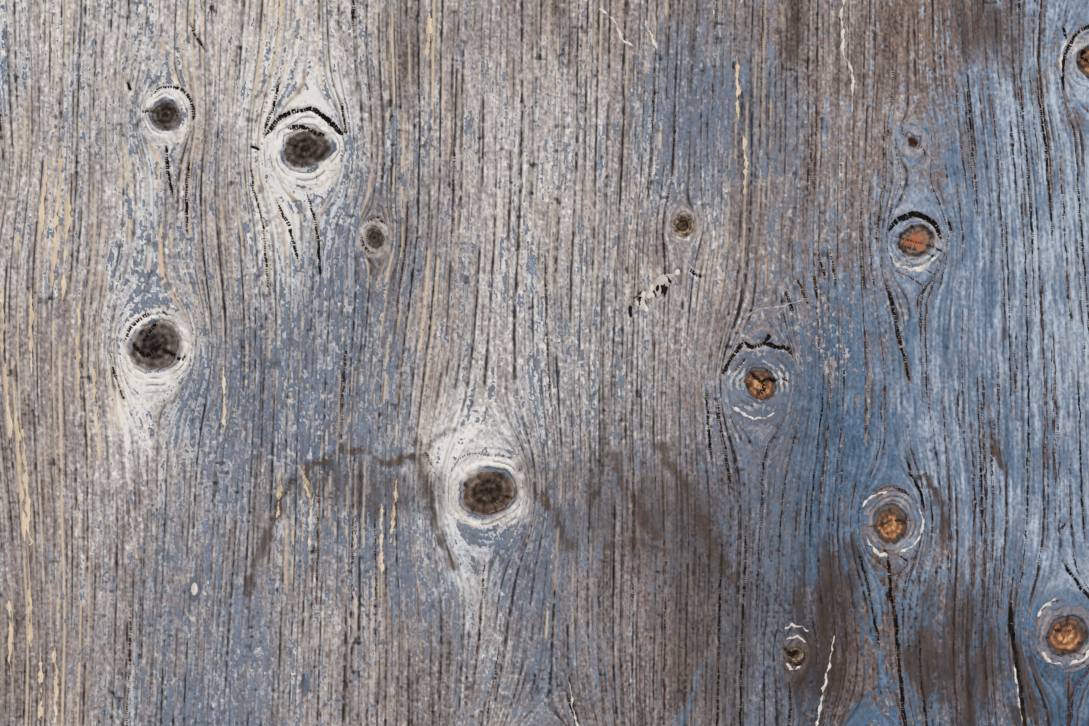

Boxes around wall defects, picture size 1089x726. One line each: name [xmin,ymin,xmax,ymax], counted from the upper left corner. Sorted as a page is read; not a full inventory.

peeling [235,0,334,192]
peeling [320,6,391,110]
peeling [437,43,519,149]
peeling [860,10,881,127]
peeling [524,133,575,207]
peeling [423,202,487,382]
peeling [129,410,157,439]
peeling [460,356,512,431]
peeling [476,462,523,482]
peeling [34,490,126,686]